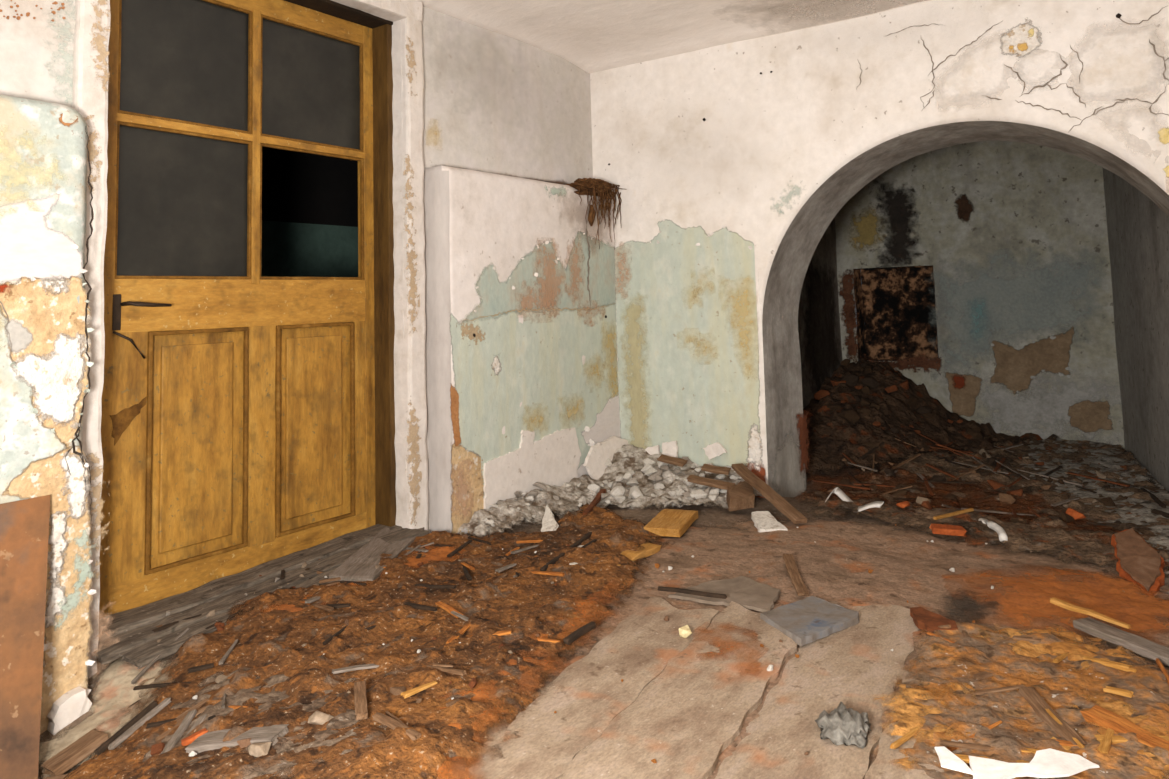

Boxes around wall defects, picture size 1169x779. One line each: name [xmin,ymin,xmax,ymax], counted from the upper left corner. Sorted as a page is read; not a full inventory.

crack [887,23,999,109]
spalling [1000,20,1041,57]
crack [982,5,1169,131]
peeling [59,113,102,191]
spalling [1158,128,1169,144]
peeling [450,219,810,535]
peeling [838,269,1114,439]
spalling [0,194,109,735]